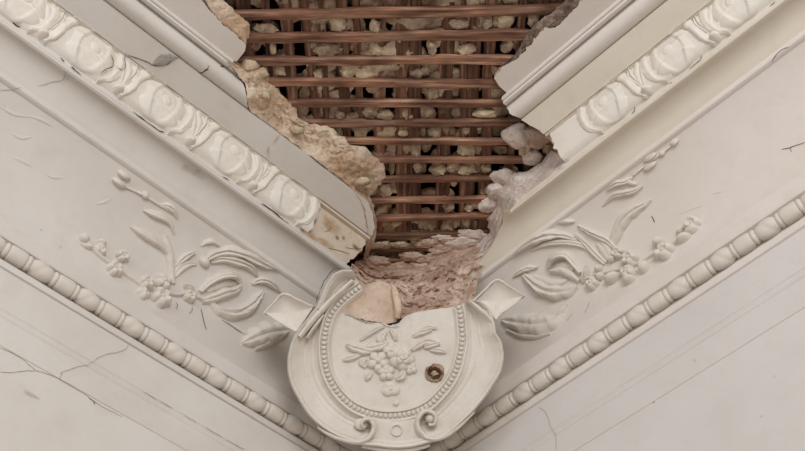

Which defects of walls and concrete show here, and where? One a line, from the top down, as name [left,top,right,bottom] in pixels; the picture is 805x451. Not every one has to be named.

flaking render [205,0,250,45]
flaking render [500,0,580,67]
flaking render [228,59,566,325]
crack [2,345,128,417]
corrosion [425,363,444,383]